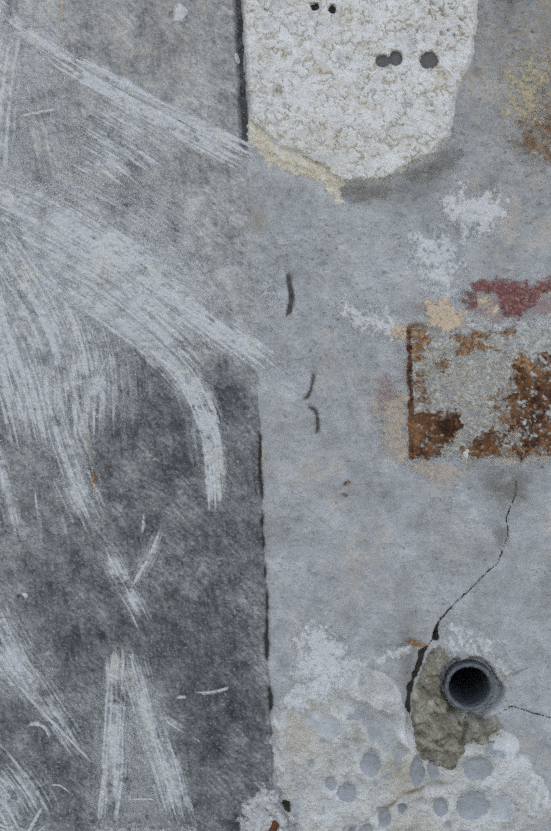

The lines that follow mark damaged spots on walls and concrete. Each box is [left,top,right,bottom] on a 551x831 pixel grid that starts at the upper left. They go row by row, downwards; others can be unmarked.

corrosion [403,322,551,465]
crack [405,481,517,715]
spalling [410,645,503,770]